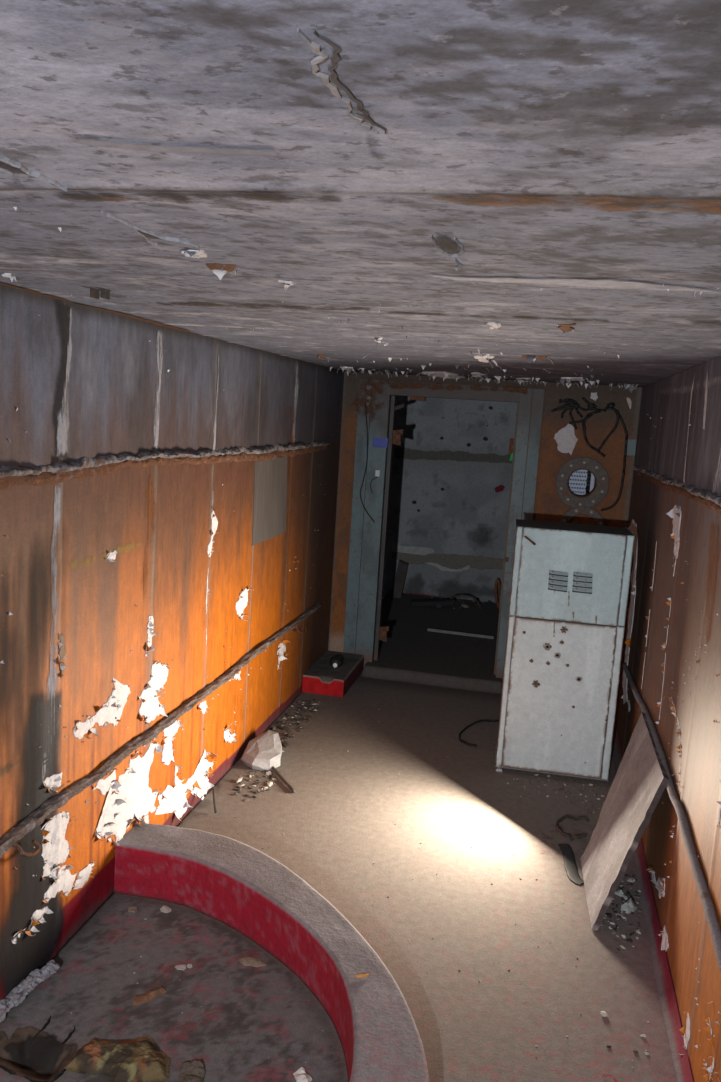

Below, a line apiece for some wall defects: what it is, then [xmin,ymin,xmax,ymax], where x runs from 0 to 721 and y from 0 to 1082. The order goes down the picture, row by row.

rust [432,195,721,213]
water stain [57,310,72,456]
peeling [317,337,639,401]
flaking render [554,423,578,455]
rust [0,420,329,536]
water stain [47,488,60,733]
peeling [235,588,254,621]
peeling [65,616,218,845]
peeling [223,711,237,744]
peeling [43,770,71,793]
peeling [11,811,97,944]
peeling [659,925,669,952]